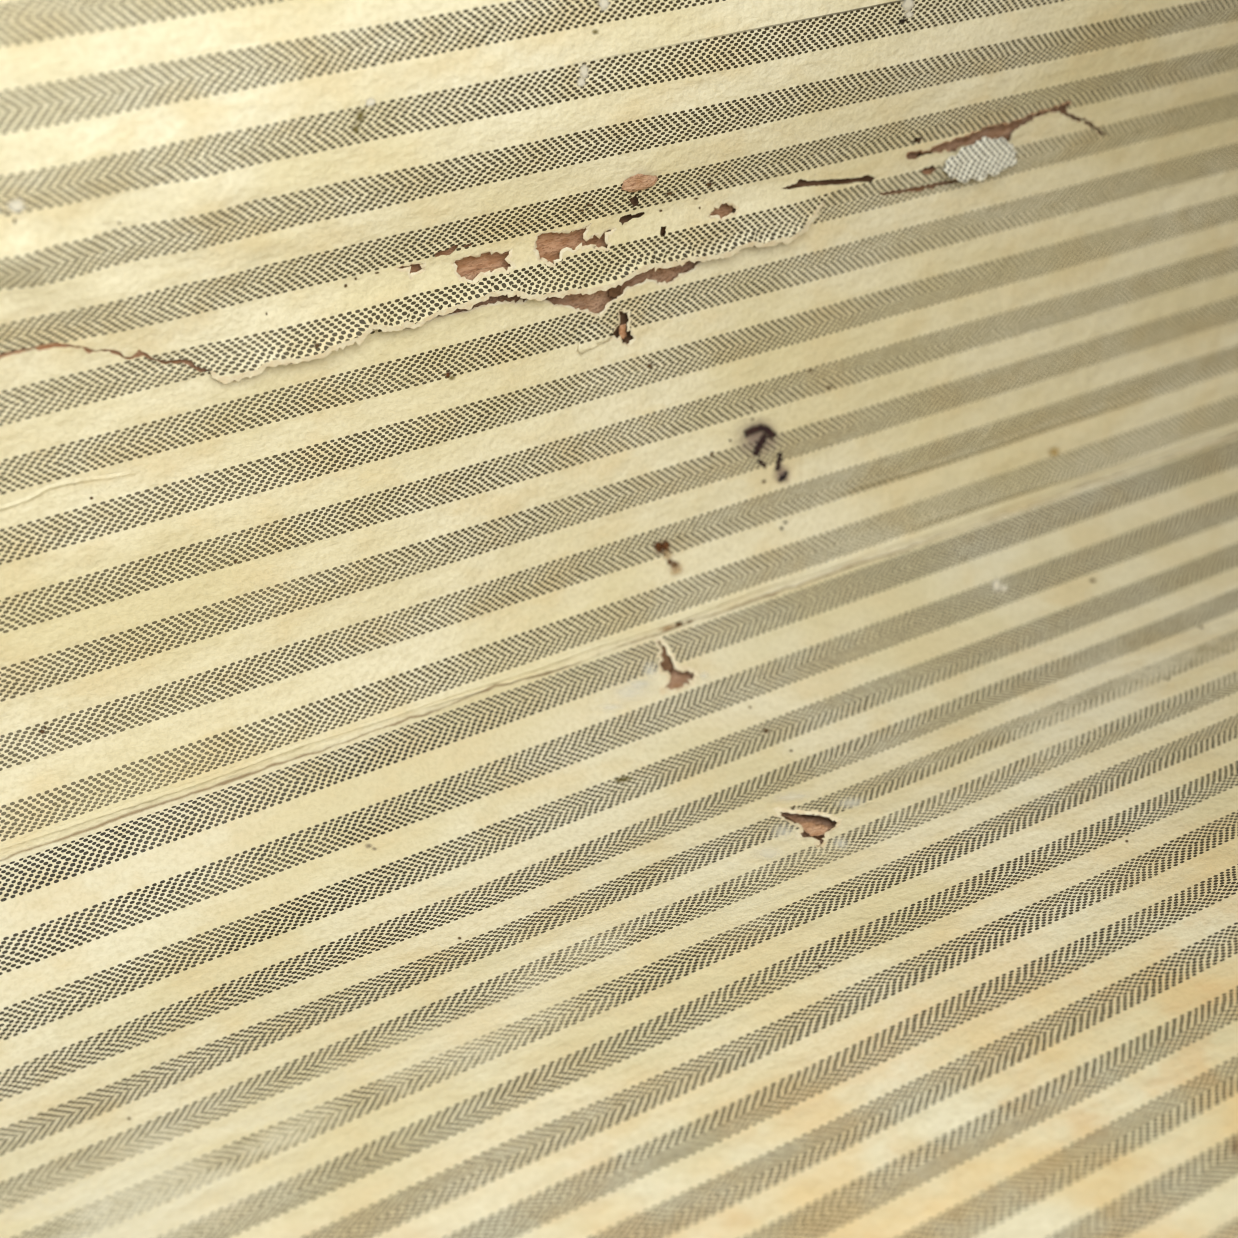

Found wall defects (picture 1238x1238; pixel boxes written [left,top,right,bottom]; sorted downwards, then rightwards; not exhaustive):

peeling [621,174,658,192]
peeling [578,323,614,354]
crack [0,343,209,372]